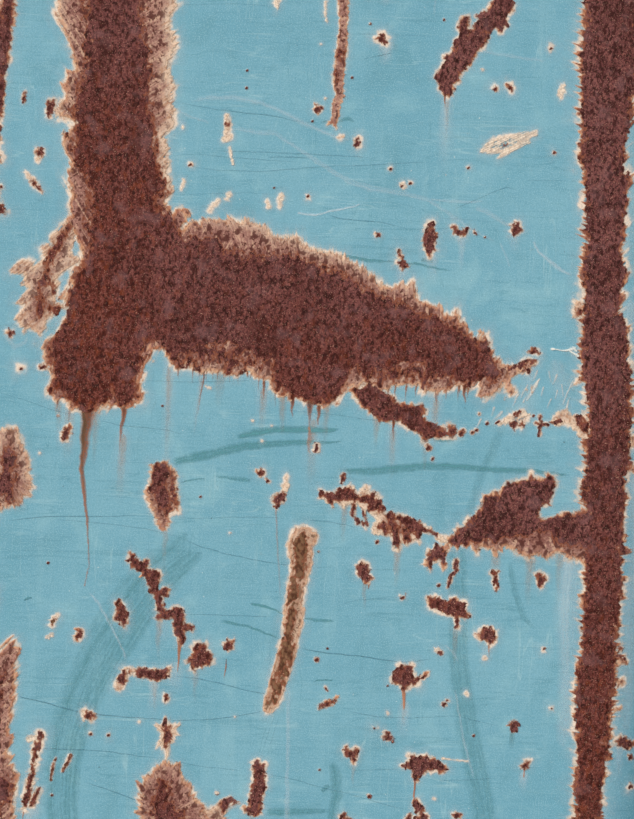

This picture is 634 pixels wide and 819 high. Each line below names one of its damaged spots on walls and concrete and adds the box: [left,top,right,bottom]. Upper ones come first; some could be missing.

peeling [480,130,538,159]
corrosion [0,0,543,550]
corrosion [317,0,634,819]
corrosion [0,634,72,819]
corrosion [112,551,216,704]
corrosion [134,717,269,819]
corrosion [221,638,235,652]
corrosion [263,524,320,716]